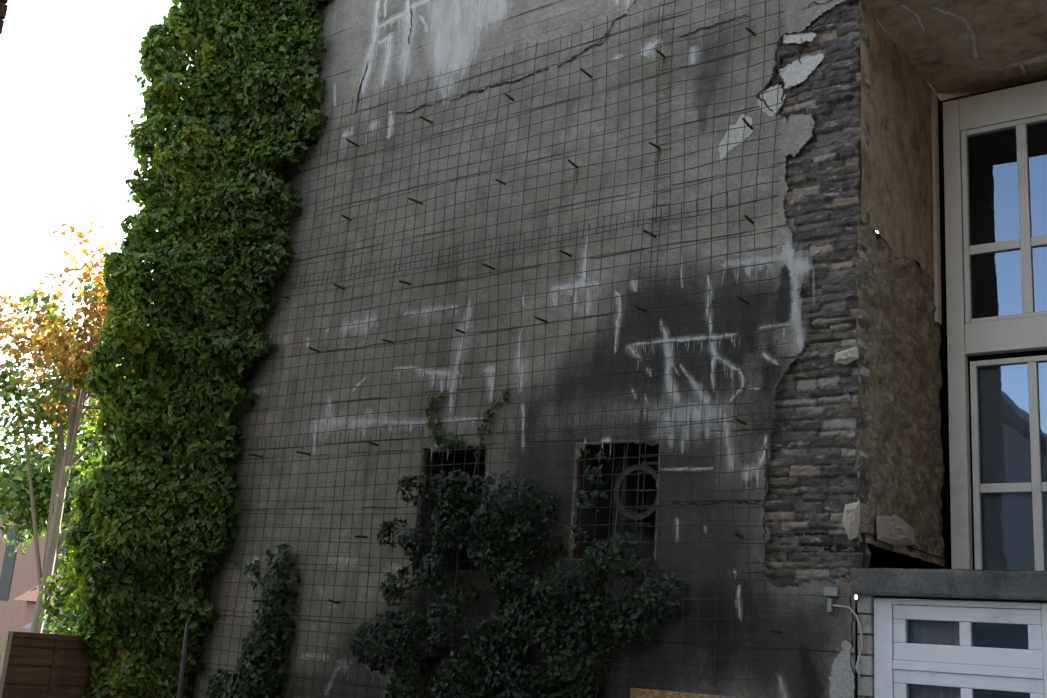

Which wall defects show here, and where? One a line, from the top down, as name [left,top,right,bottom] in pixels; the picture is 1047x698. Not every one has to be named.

crack [355,61,368,114]
water stain [362,0,505,93]
crack [397,0,636,114]
crack [679,15,750,37]
spalling [718,0,947,588]